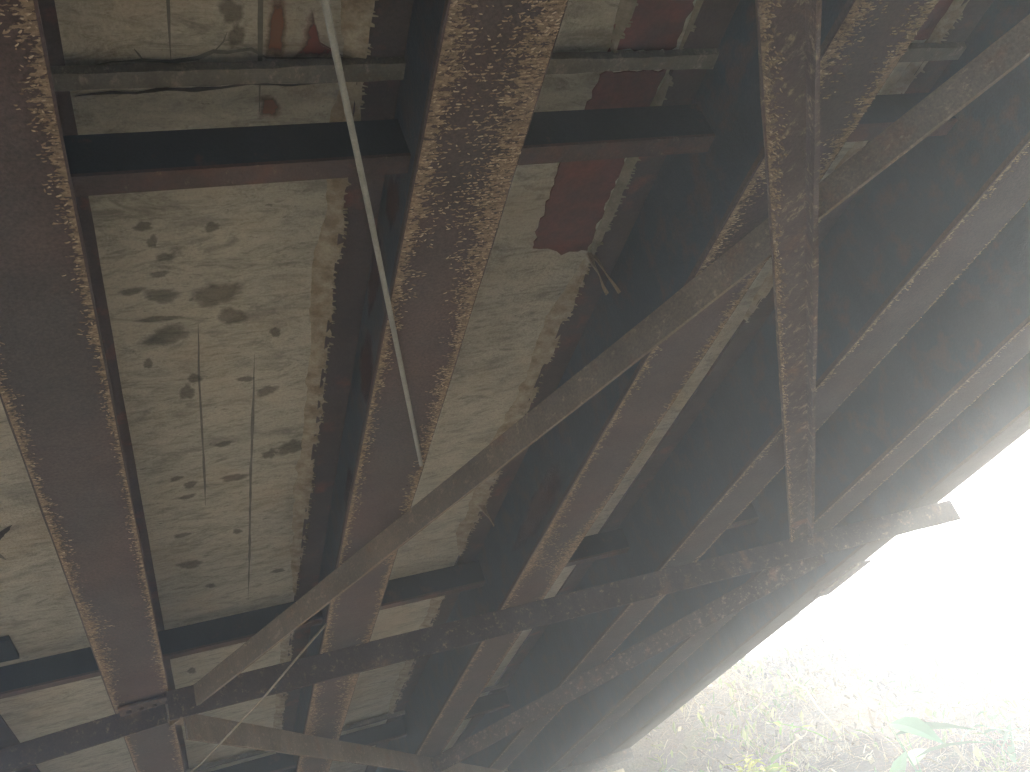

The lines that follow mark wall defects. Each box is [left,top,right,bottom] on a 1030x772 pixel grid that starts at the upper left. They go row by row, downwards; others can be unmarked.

corrosion [268,0,285,55]
corrosion [296,14,332,57]
damp [121,288,175,302]
damp [196,286,245,323]
corrosion [369,250,379,312]
damp [142,316,184,344]
damp [264,440,301,458]